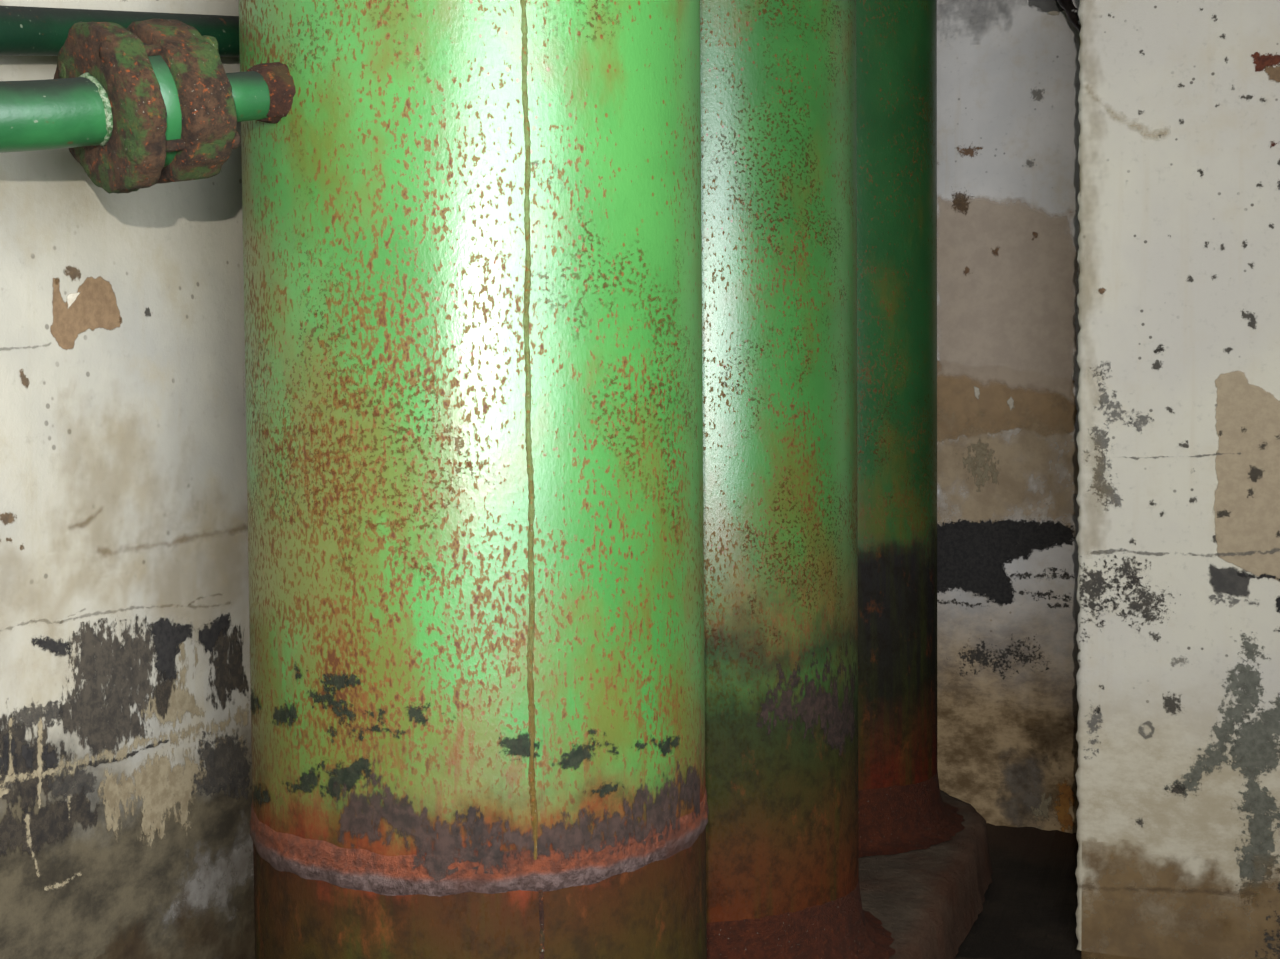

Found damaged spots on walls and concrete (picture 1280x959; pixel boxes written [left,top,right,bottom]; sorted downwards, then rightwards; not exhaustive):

peeling [50,266,122,350]
rust [545,214,697,532]
rust [250,281,473,580]
peeling [1214,371,1280,582]
leakage [1008,567,1075,609]
leakage [1209,592,1259,605]
leakage [1237,572,1280,581]
leakage [0,642,252,891]
leakage [1081,850,1280,959]